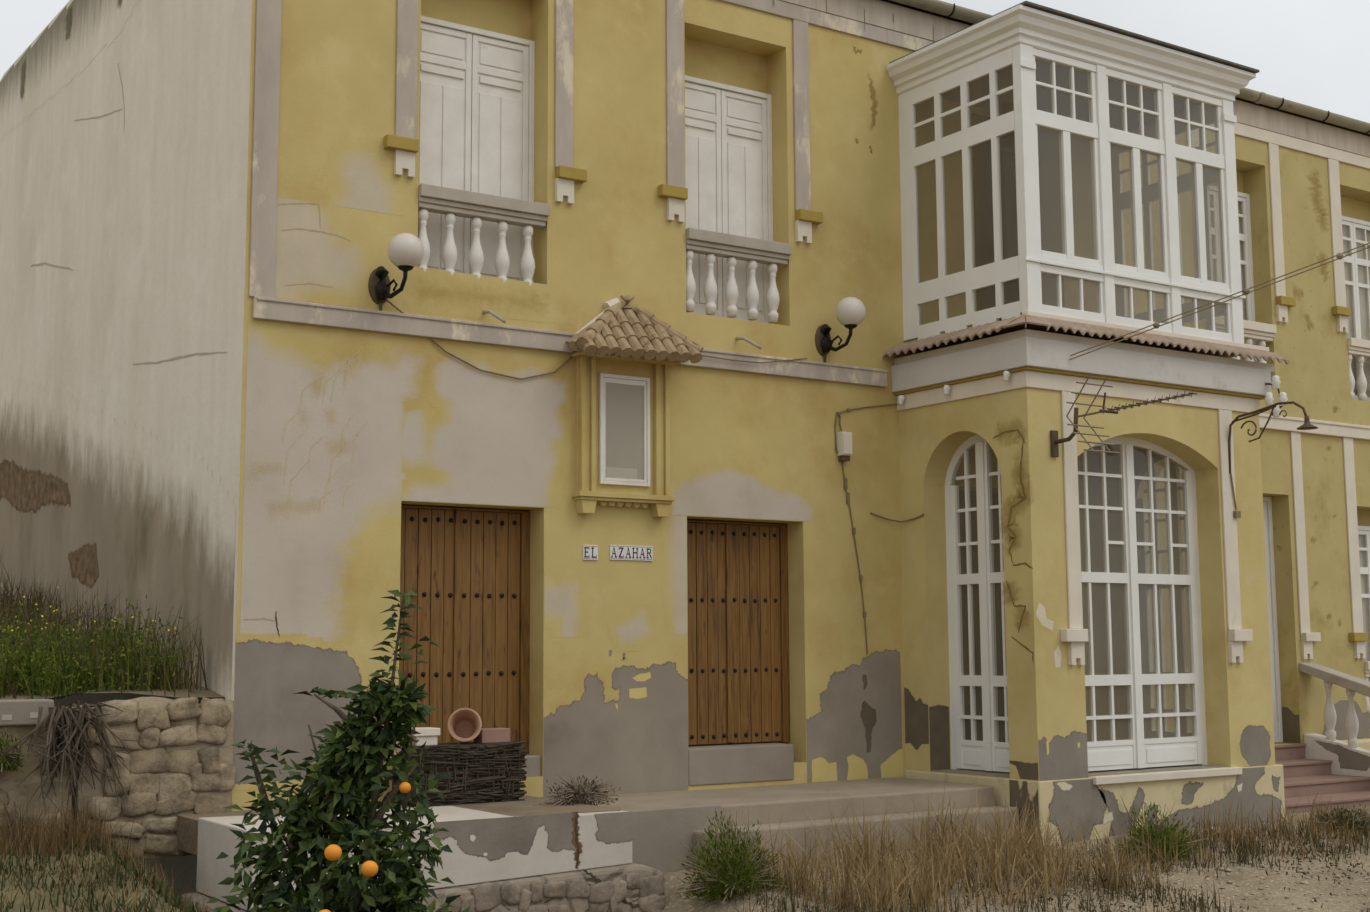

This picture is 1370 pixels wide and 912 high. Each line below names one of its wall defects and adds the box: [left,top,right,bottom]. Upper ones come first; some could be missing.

crack [133,352,227,365]
flaking render [0,460,71,513]
flaking render [68,543,99,588]
damp [0,377,236,704]
peeling [433,462,818,861]
peeling [806,643,903,783]
peeling [1038,721,1282,845]